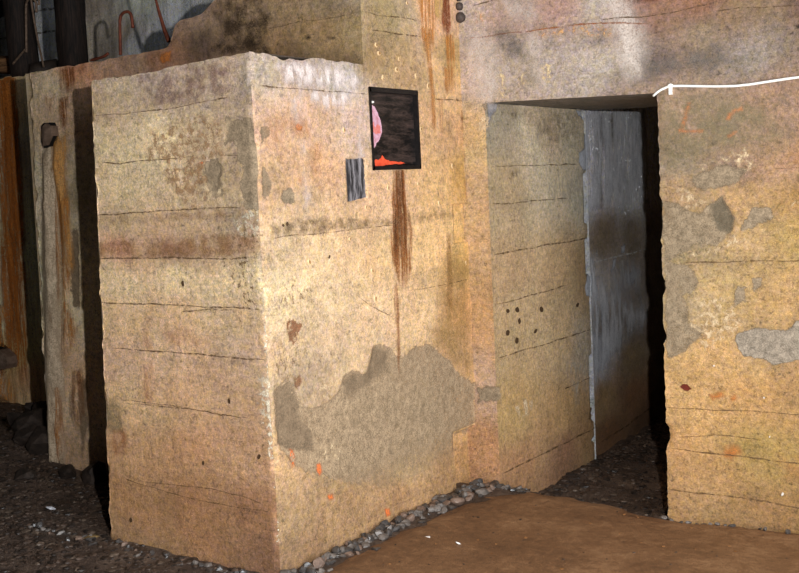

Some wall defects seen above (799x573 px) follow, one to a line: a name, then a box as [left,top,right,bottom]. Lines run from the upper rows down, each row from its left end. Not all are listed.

corrosion [419,0,455,120]
corrosion [0,77,27,373]
corrosion [391,170,412,279]
spalling [692,149,752,190]
spalling [662,194,799,365]